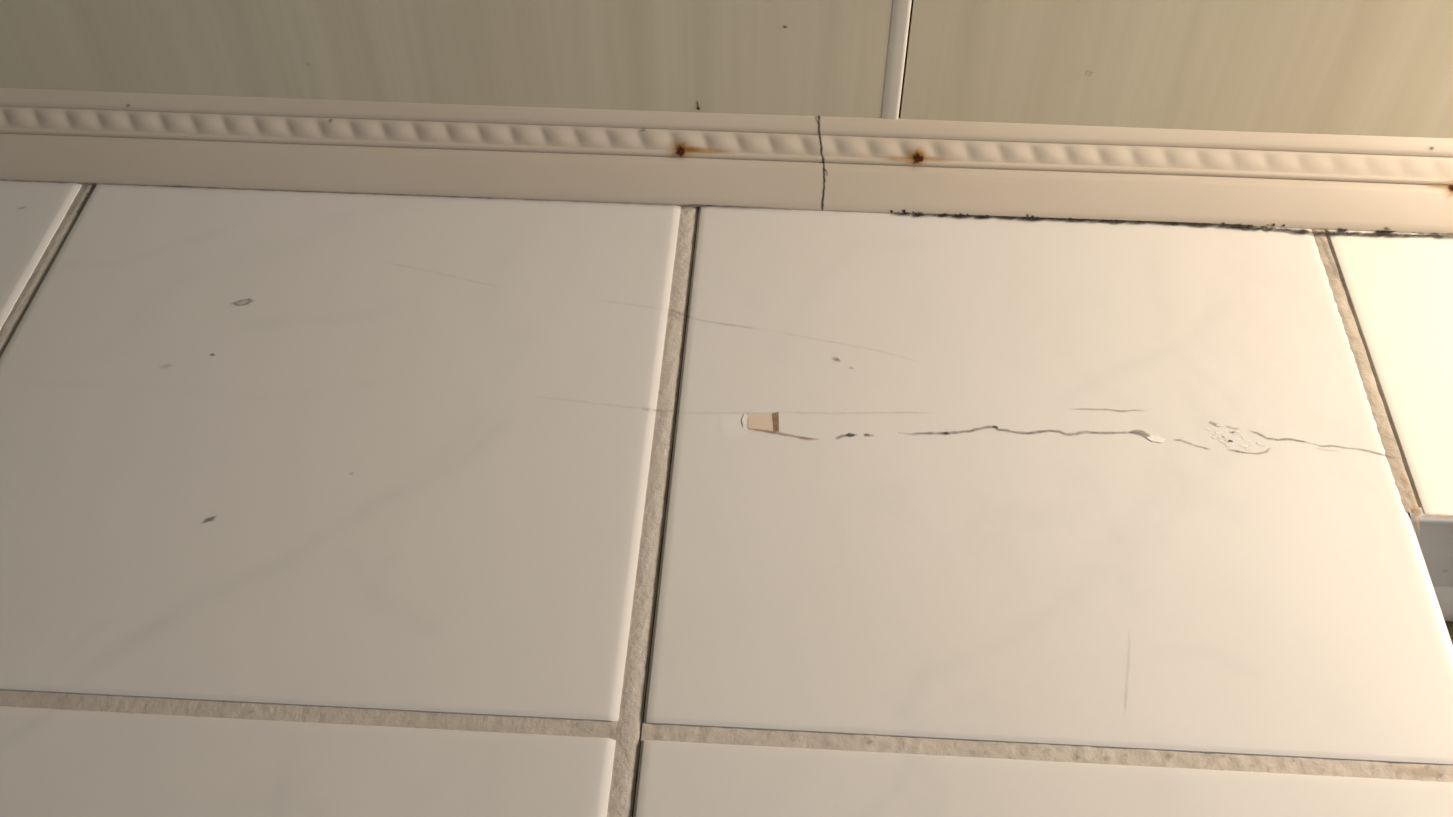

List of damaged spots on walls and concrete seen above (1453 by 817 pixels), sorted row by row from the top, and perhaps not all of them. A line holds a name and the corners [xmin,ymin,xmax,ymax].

rust [676,144,716,156]
water stain [890,210,1453,238]
spalling [719,412,811,439]